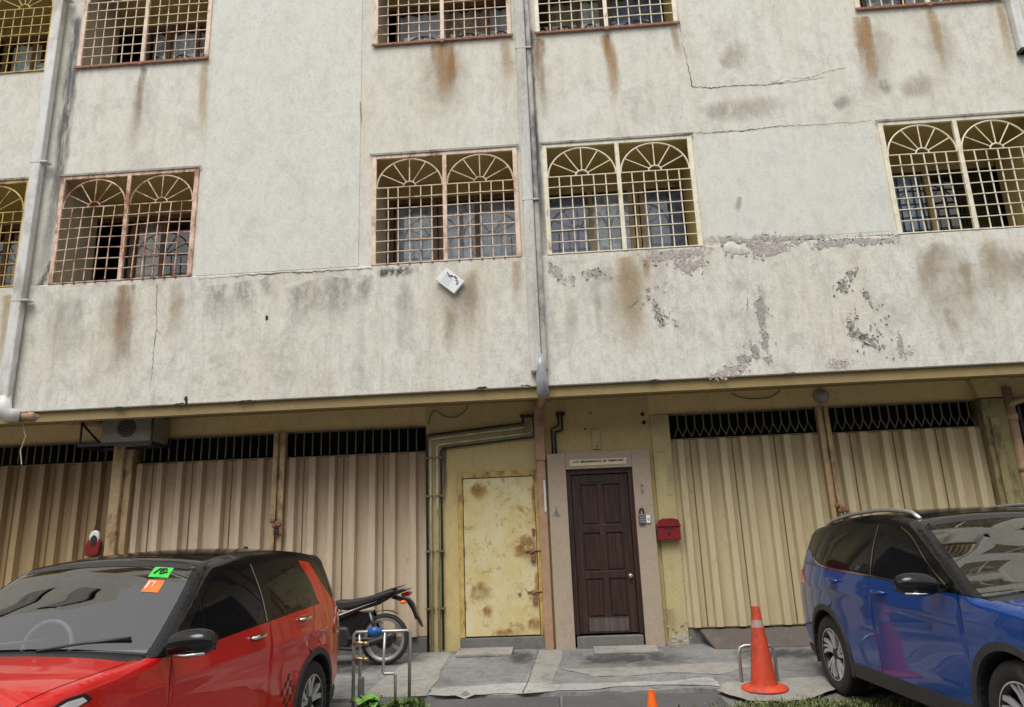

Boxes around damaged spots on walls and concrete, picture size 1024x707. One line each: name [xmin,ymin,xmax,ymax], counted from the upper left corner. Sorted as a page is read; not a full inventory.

corrosion [603,34,615,70]
crack [678,18,842,89]
water stain [51,19,81,210]
spalling [637,230,901,275]
peeling [640,282,677,328]
spalling [706,283,777,381]
peeling [828,266,913,369]